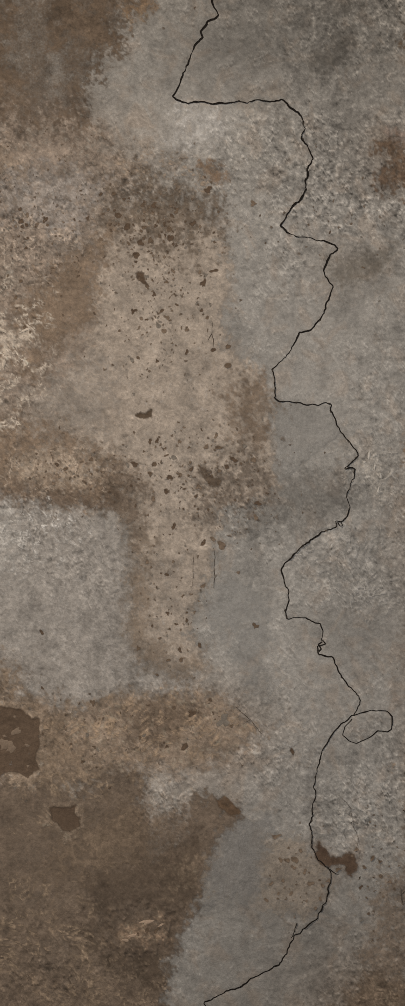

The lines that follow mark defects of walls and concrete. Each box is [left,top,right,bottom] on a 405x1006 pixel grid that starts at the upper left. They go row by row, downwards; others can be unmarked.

spalling [5,206,49,249]
peeling [14,201,339,774]
crack [172,0,393,1006]
spalling [0,696,46,790]
spalling [42,801,85,841]
spalling [279,841,392,910]